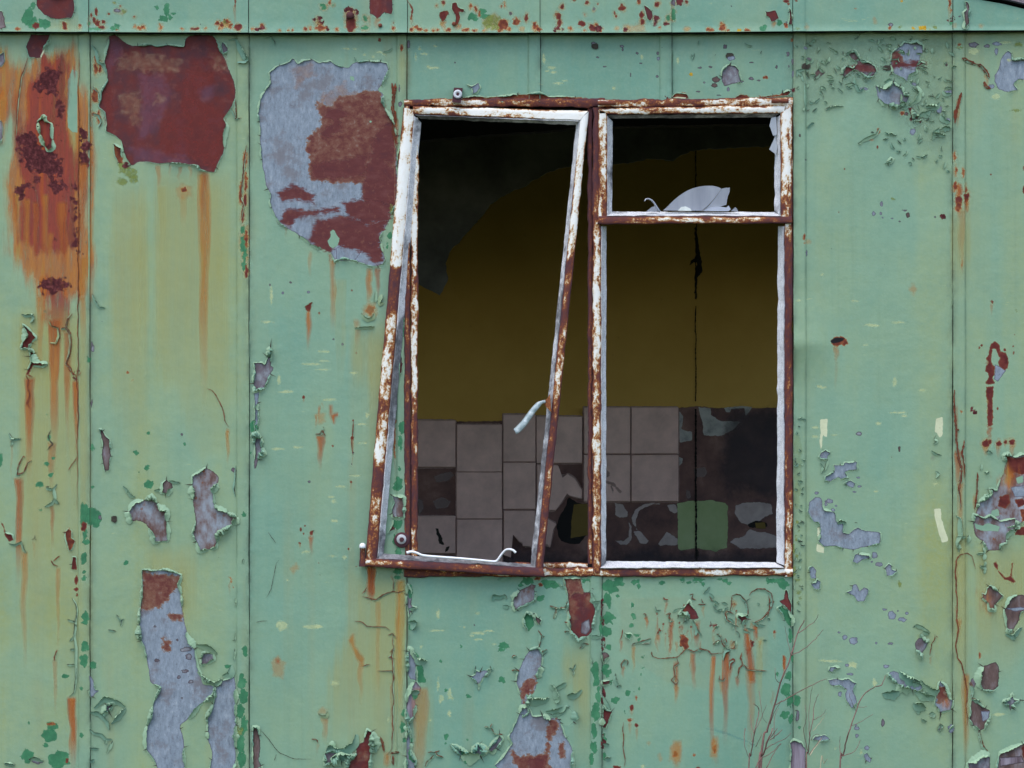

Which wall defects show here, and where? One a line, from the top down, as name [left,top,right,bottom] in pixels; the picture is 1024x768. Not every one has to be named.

peeling [239,58,402,304]
rust [0,43,95,494]
rust [361,345,383,387]
rust [985,341,1009,434]
peeling [186,464,246,554]
peeling [387,421,456,557]
peeling [970,439,1024,552]
peeling [135,568,264,768]
peeling [444,646,576,768]
rust [656,605,702,652]
peeling [503,406,902,768]
rust [704,587,775,690]